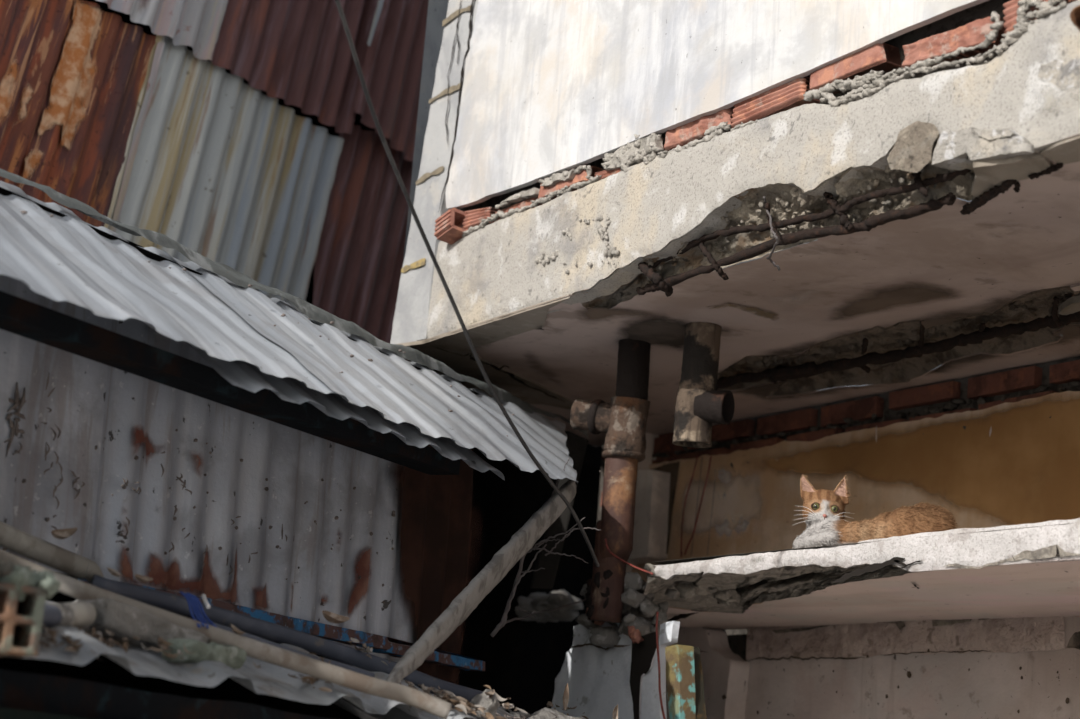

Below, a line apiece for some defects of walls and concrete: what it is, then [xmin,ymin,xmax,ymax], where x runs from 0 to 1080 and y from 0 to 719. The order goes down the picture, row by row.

crack [438,0,474,213]
spalling [572,121,1063,309]
spalling [717,284,1080,396]
rust [134,428,156,463]
rust [121,548,238,603]
rust [254,584,268,610]
rust [348,548,371,616]
spalling [644,557,922,614]